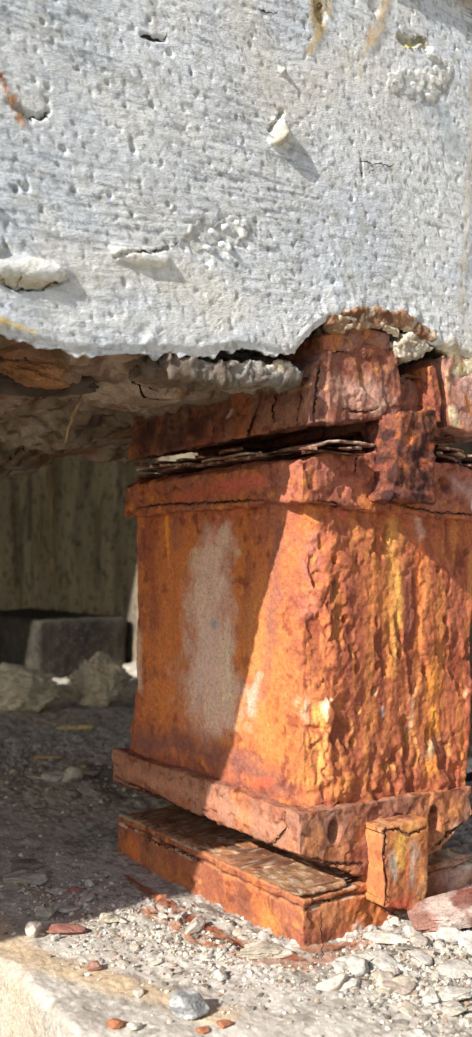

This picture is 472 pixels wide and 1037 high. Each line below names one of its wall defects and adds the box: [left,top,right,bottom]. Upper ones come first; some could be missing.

corrosion [0,73,24,122]
spalling [128,352,304,395]
corrosion [133,440,376,479]
corrosion [434,445,472,470]
corrosion [127,808,360,896]
corrosion [123,875,248,947]
corrosion [289,941,356,960]